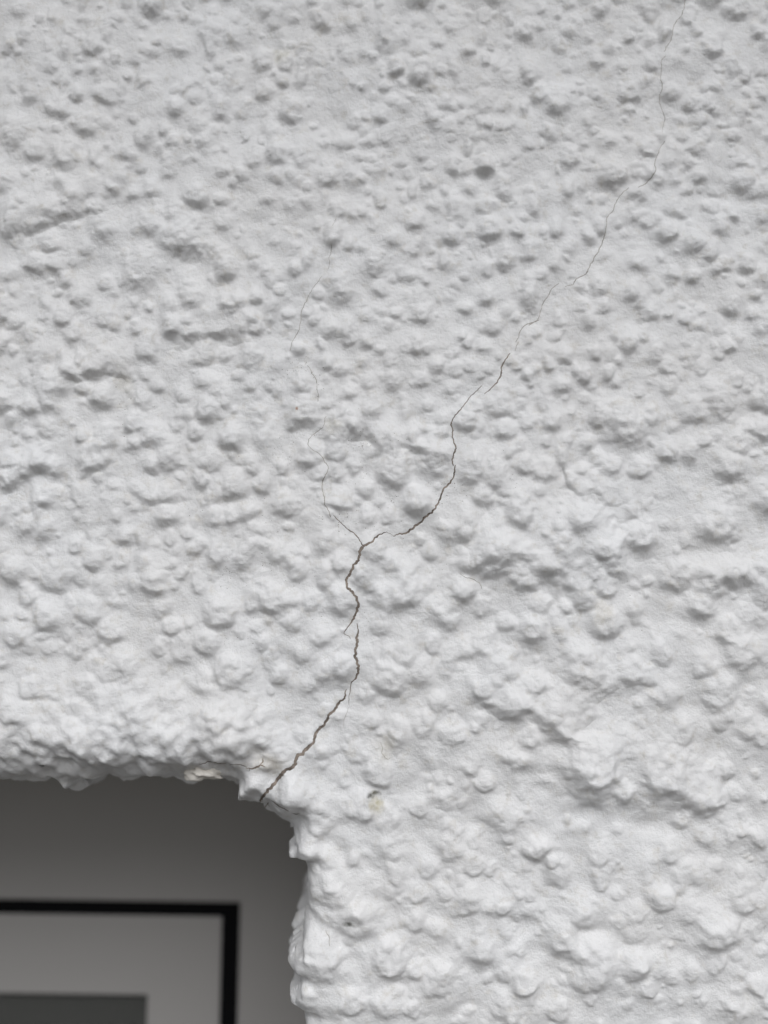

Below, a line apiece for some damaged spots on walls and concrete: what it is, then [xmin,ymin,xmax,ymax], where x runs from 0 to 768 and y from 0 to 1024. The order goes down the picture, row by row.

crack [202,2,685,815]